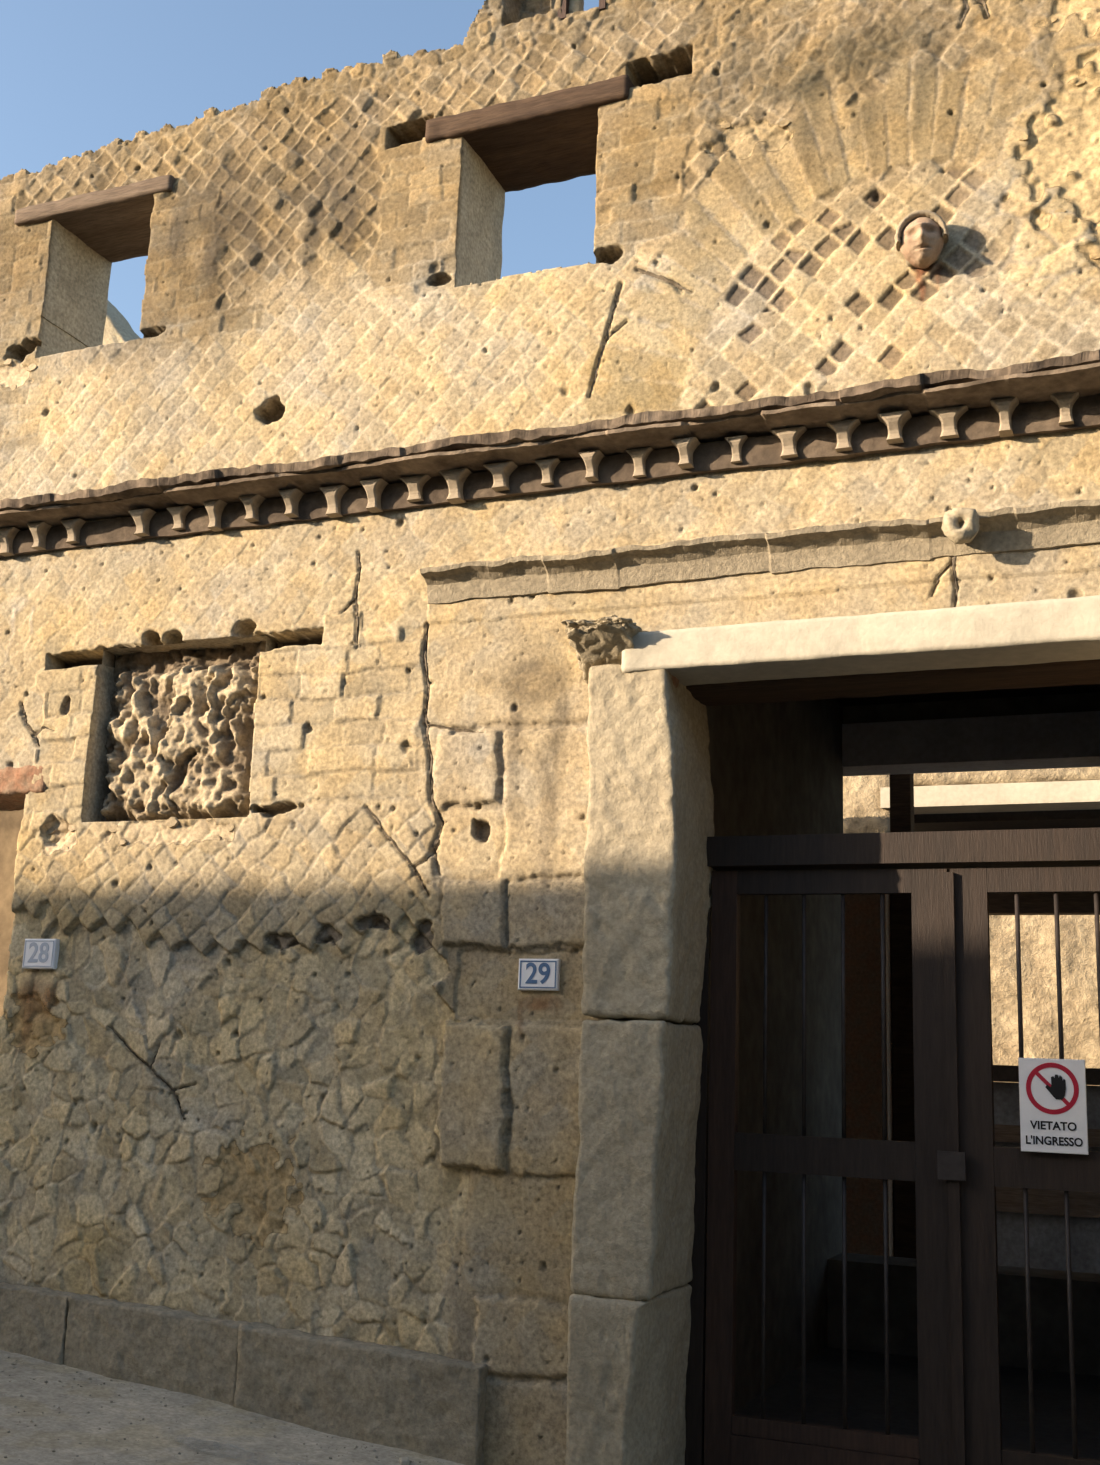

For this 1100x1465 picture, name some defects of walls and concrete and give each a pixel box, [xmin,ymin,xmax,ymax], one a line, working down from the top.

crack [589,268,691,398]
crack [932,556,958,607]
crack [108,1026,196,1120]